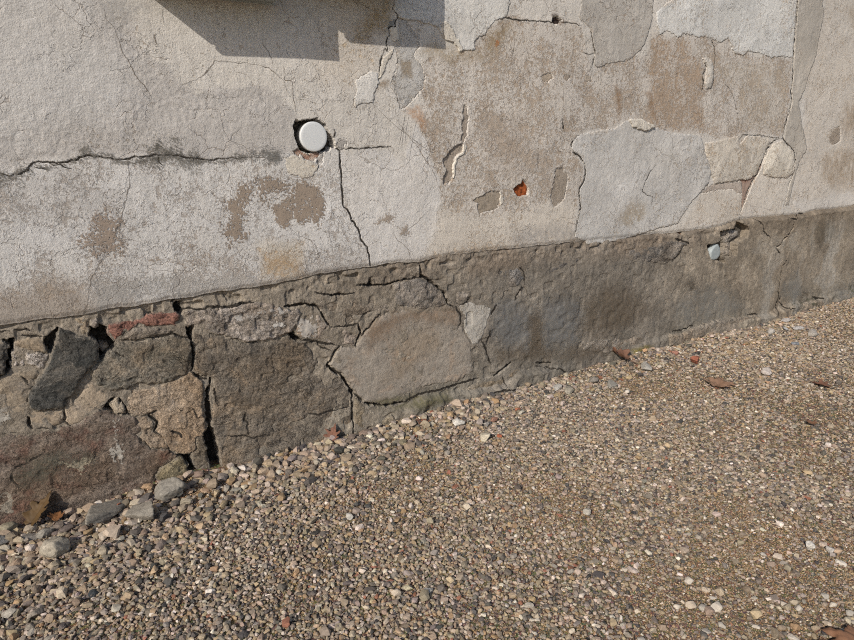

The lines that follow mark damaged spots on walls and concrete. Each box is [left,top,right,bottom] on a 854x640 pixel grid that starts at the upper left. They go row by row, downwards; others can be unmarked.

crack [353,4,412,106]
peeling [354,18,425,109]
crack [2,154,269,231]
peeling [214,149,332,249]
spalling [443,105,468,184]
spalling [473,191,504,214]
spalling [513,180,527,196]
spalling [550,167,567,206]
crack [560,100,586,232]
peeling [703,164,762,208]
crack [701,4,824,315]
crack [284,121,528,434]